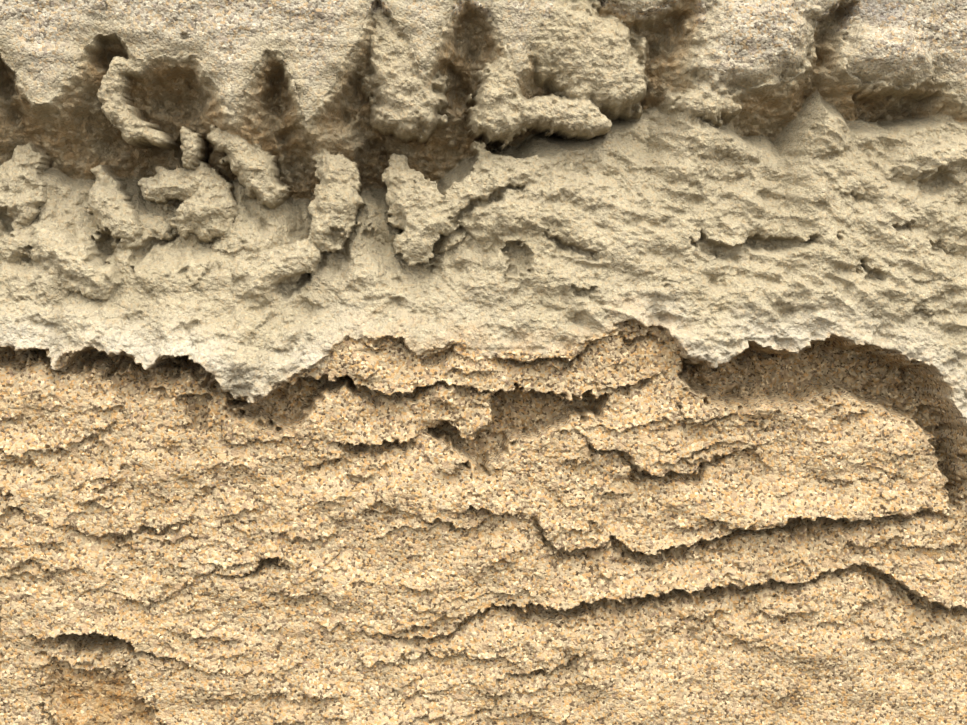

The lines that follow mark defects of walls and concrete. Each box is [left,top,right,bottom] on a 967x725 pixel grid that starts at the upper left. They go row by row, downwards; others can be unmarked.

spalling [0,73,967,524]
peeling [344,465,967,654]
spalling [0,609,198,725]
peeling [439,632,594,725]